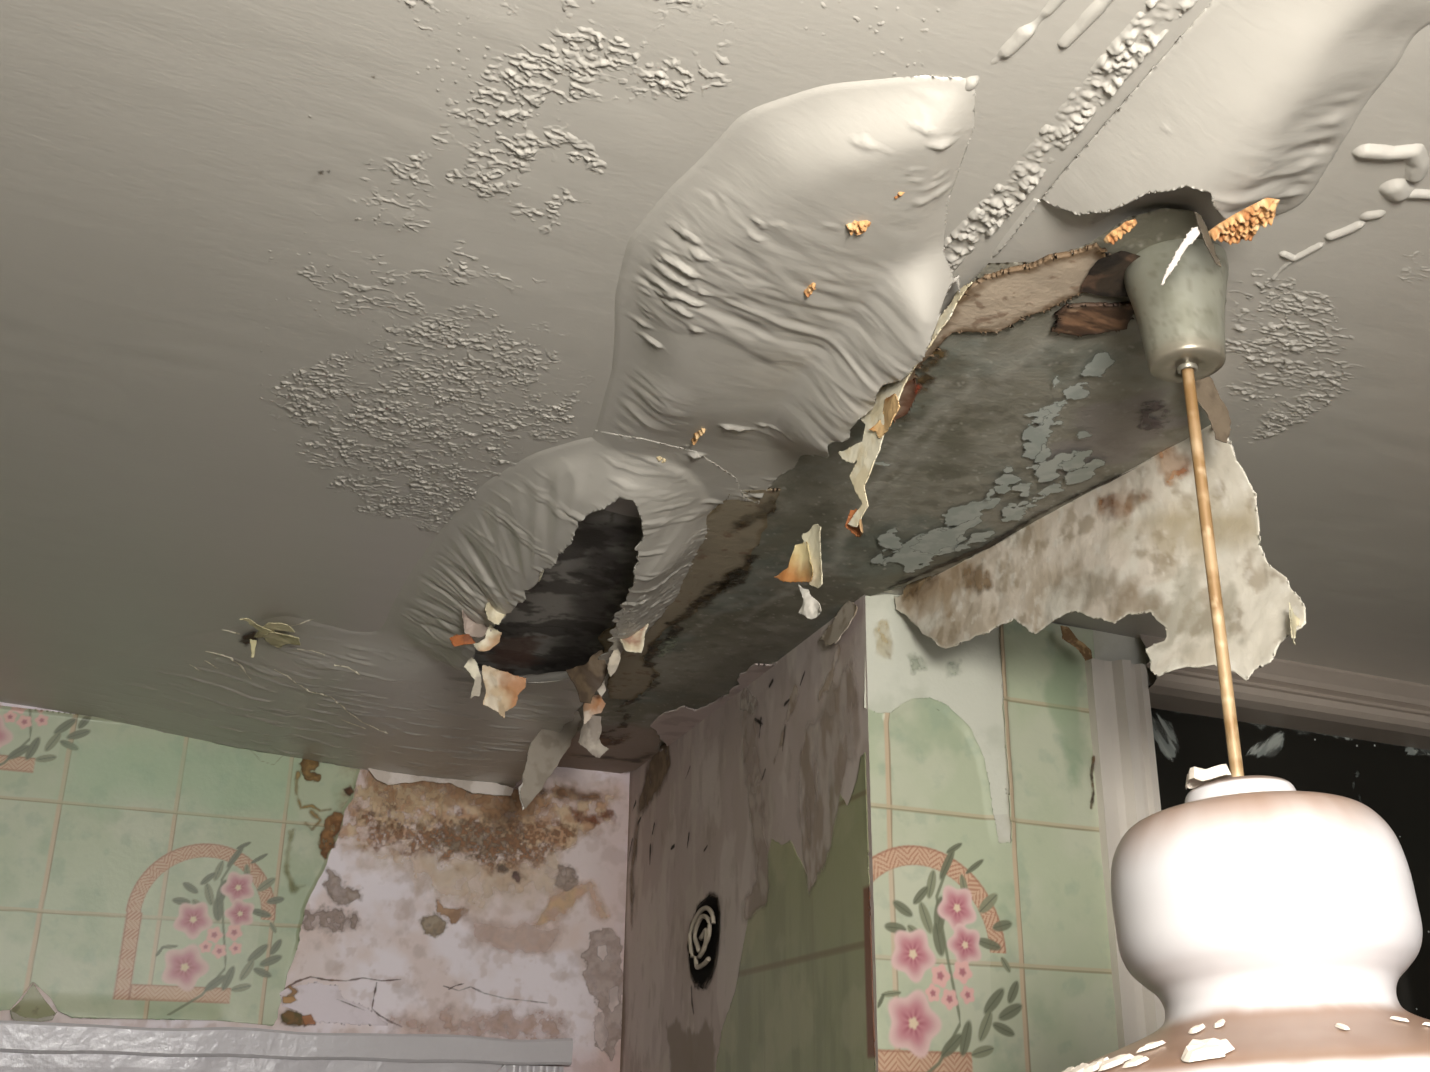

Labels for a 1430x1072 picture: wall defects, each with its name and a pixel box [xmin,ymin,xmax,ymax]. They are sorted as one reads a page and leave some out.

spalling [1208,198,1280,245]
spalling [1080,219,1140,297]
damp [915,348,947,393]
peeling [893,378,917,422]
damp [644,555,758,688]
damp [599,699,638,746]
flaking render [819,592,1007,815]
damp [800,645,857,890]
peeling [1185,764,1231,790]
peeling [279,981,388,1026]
peeling [581,928,623,1060]